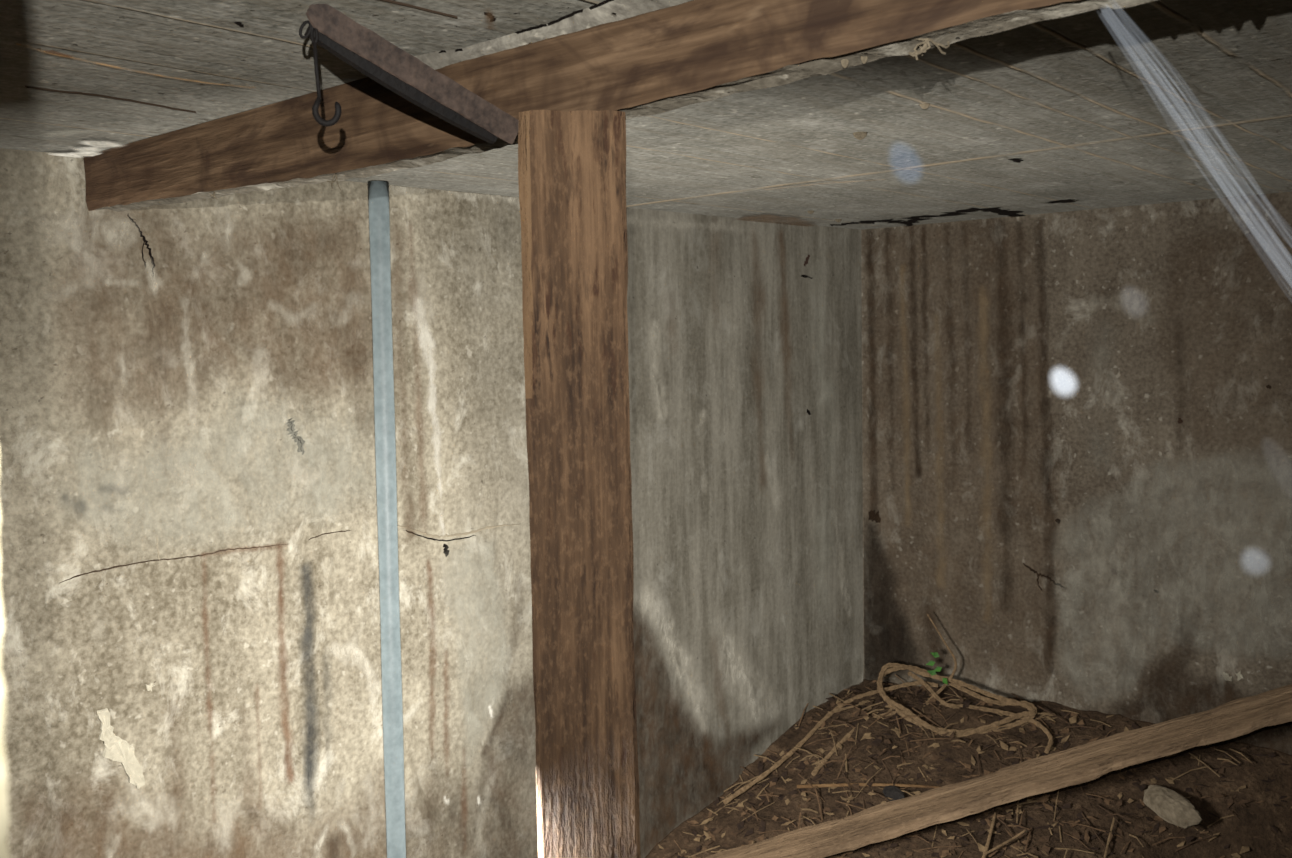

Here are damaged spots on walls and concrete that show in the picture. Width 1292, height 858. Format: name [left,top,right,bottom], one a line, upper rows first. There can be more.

crack [830,207,1026,226]
crack [60,530,351,583]
damp [864,530,913,680]
damp [304,614,312,658]
damp [306,695,315,787]